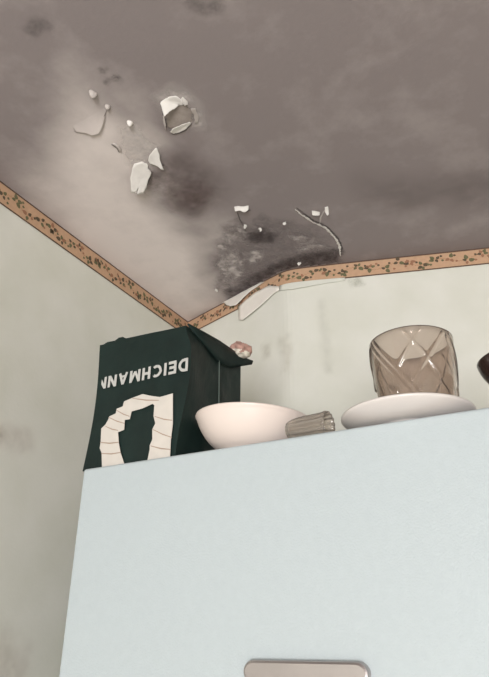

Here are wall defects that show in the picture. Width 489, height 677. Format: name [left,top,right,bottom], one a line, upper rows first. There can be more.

peeling [160,93,201,135]
peeling [123,128,164,195]
peeling [234,206,250,230]
crack [295,206,343,256]
water stain [217,223,337,296]
peeling [222,282,263,306]